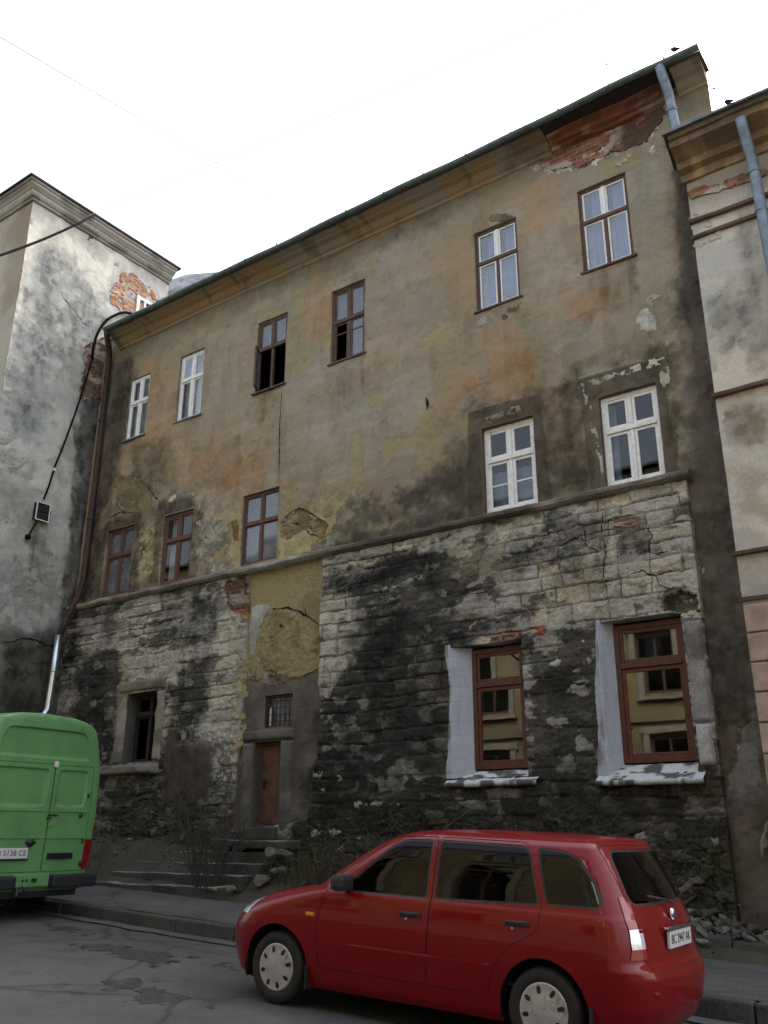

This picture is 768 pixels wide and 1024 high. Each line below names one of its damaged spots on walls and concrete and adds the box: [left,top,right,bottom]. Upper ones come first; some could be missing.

flaking render [530,105,665,175]
damp [20,251,96,386]
flaking render [107,262,163,313]
damp [112,358,132,426]
peeling [580,294,670,474]
crack [0,615,204,660]
peeling [192,515,288,795]
flaking render [278,508,337,559]
crack [272,590,354,625]
damp [336,553,433,594]
crack [551,510,694,611]
damp [659,768,709,804]